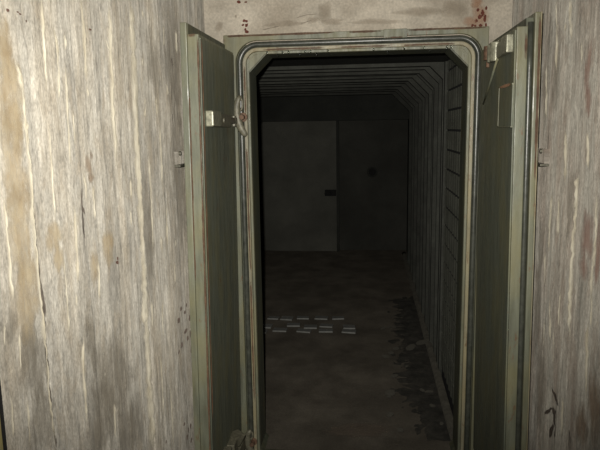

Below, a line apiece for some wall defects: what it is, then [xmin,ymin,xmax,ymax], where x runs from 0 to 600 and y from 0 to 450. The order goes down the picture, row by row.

rust [228,19,332,37]
rust [413,0,487,31]
crack [79,191,87,238]
crack [32,214,46,325]
crack [45,347,57,447]